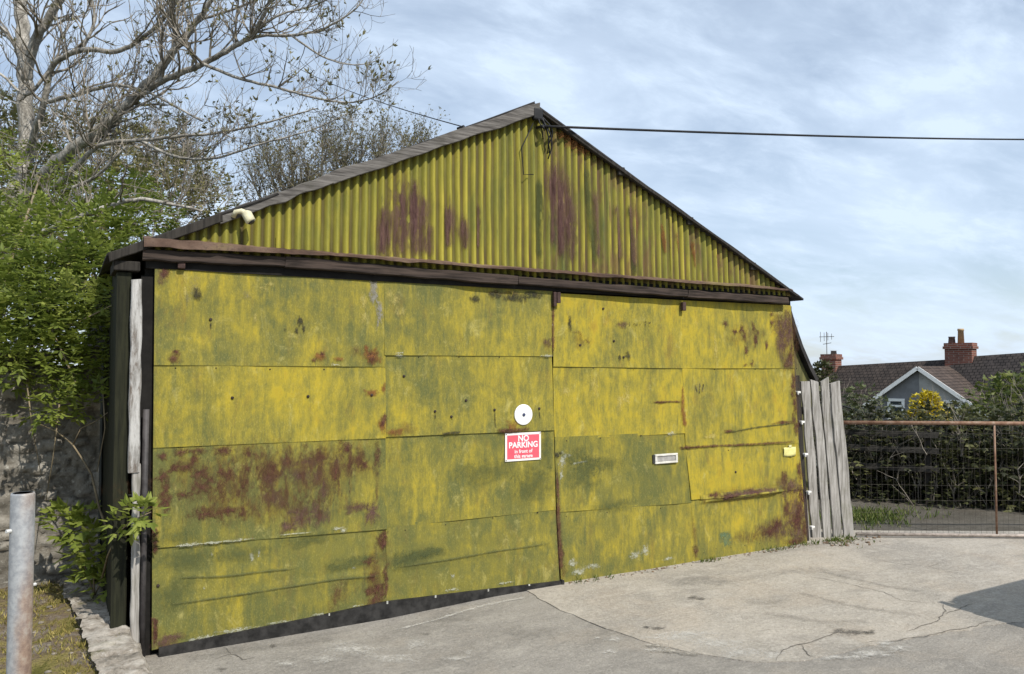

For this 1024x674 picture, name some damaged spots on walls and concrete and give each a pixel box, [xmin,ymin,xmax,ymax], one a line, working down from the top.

rust [379,184,434,254]
rust [544,168,576,261]
rust [617,207,637,262]
rust [681,313,799,449]
rust [155,442,381,531]
rust [556,477,565,568]
rust [710,463,806,545]
crack [771,560,1003,660]